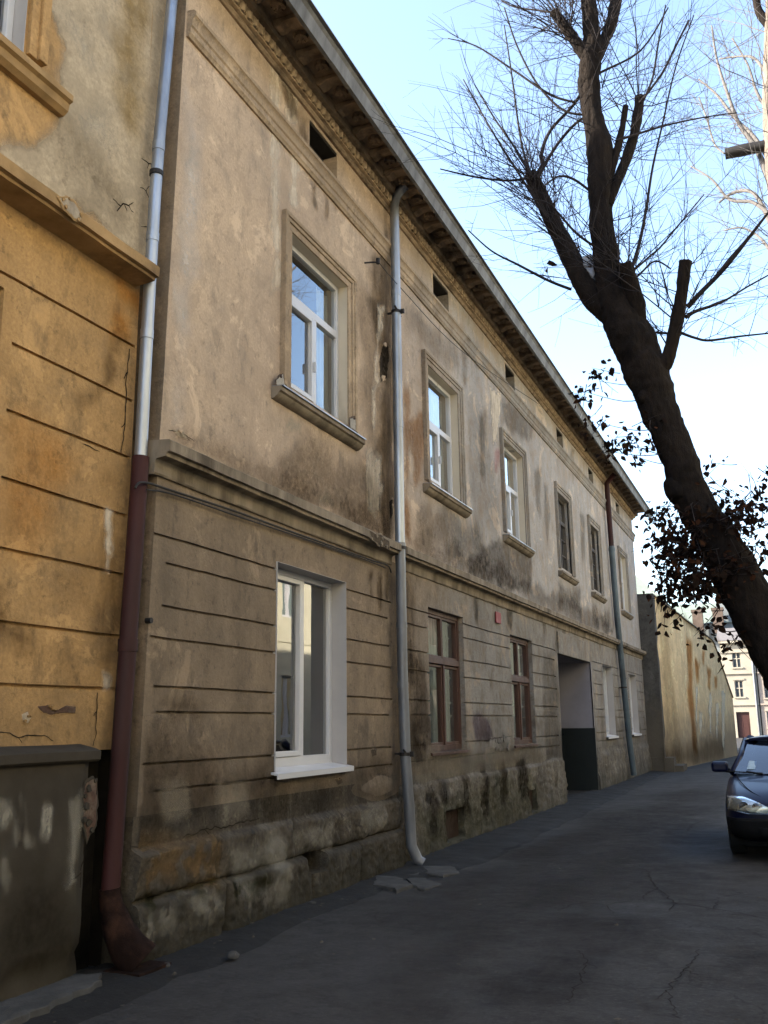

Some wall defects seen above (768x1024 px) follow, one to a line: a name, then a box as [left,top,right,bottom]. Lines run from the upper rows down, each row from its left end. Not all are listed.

crack [84,349,130,452]
spalling [19,704,78,726]
crack [2,732,53,742]